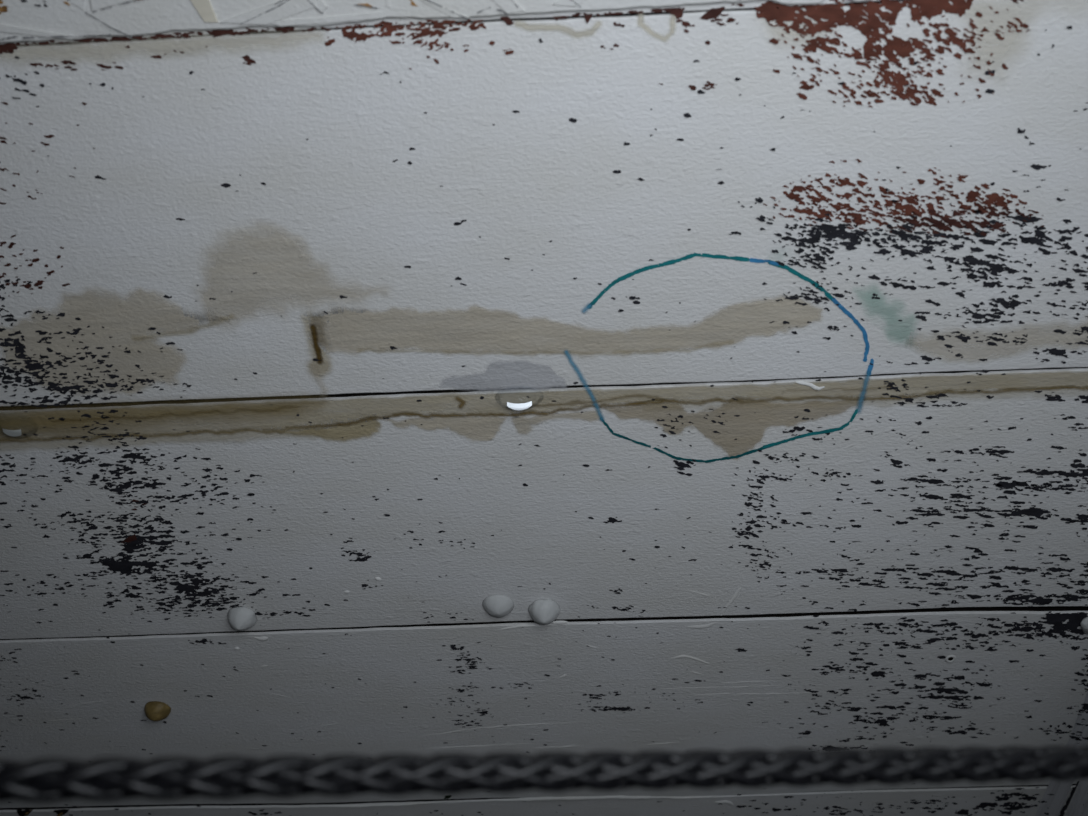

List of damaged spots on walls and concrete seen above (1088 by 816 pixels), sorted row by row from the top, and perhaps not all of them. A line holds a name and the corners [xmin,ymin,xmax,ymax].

peeling [0,19,486,64]
peeling [5,60,77,99]
peeling [795,381,825,391]
water stain [0,159,1088,750]